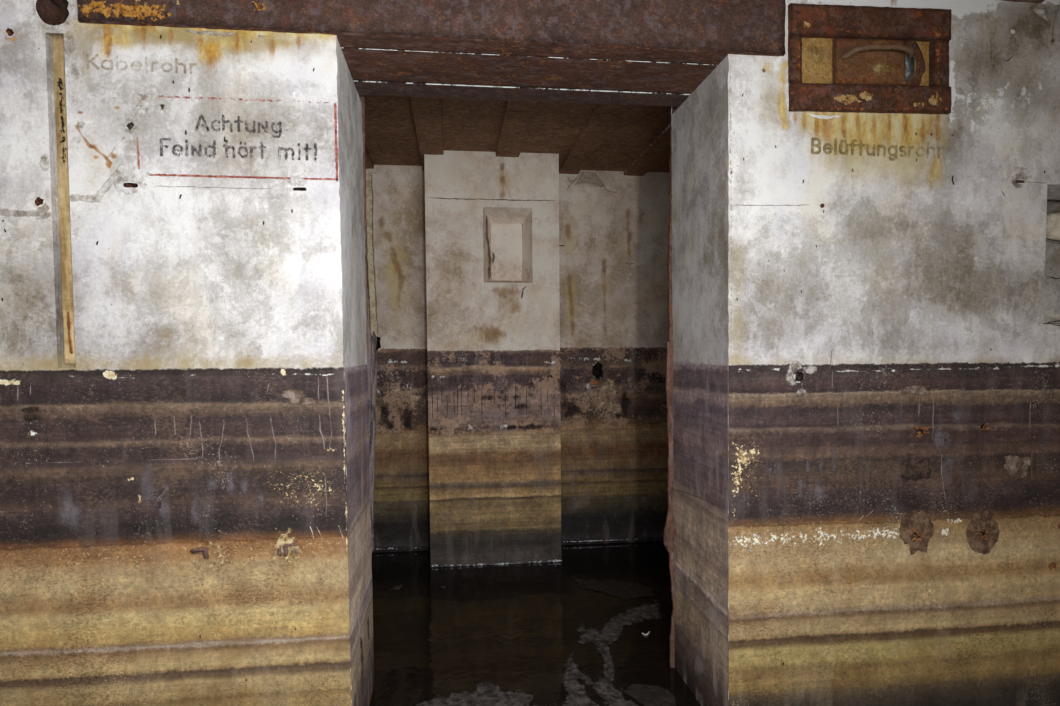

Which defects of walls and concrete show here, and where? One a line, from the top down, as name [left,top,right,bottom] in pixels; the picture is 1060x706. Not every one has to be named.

spalling [34,0,78,79]
corrosion [90,23,172,52]
corrosion [193,28,274,60]
corrosion [779,62,940,180]
spalling [786,361,817,396]
spalling [271,528,301,566]